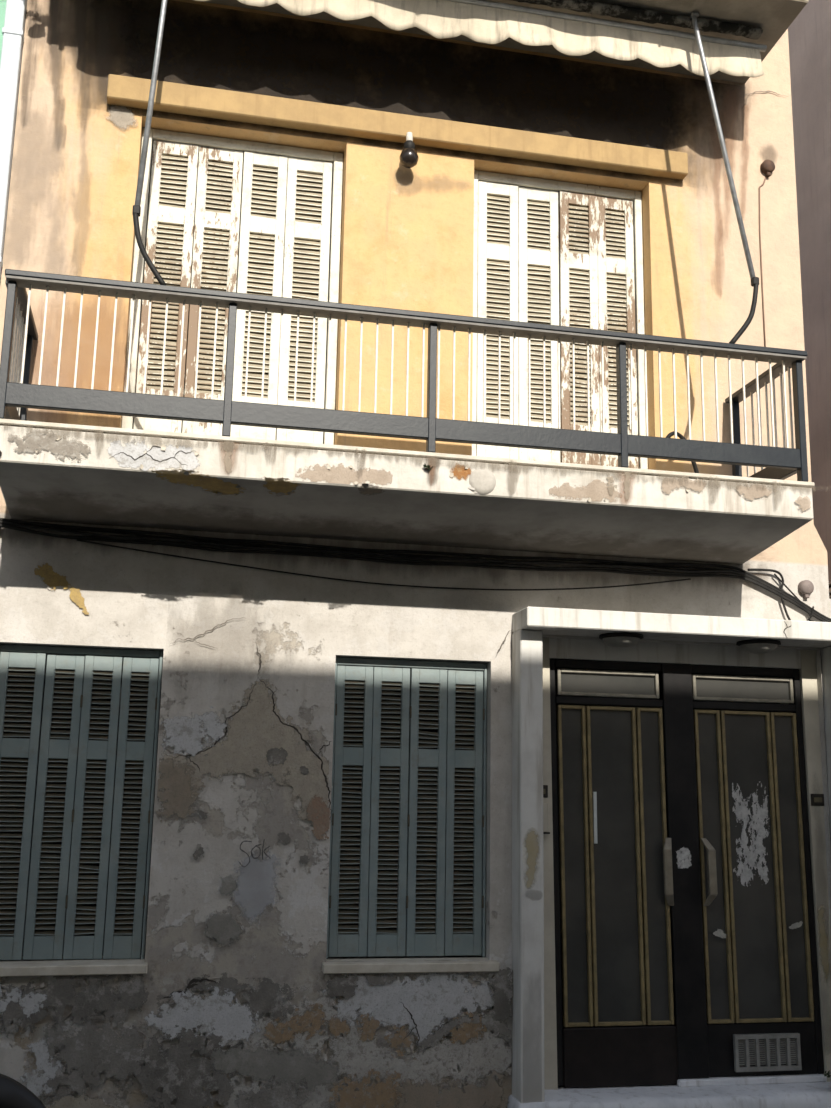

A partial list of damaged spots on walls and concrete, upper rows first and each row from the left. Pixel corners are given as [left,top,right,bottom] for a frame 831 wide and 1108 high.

peeling [0,428,91,461]
peeling [108,439,246,496]
peeling [263,463,393,497]
peeling [549,479,622,503]
peeling [661,476,706,494]
peeling [736,483,772,500]
peeling [34,562,89,615]
crack [169,618,241,649]
crack [163,644,332,823]
spalling [161,679,332,840]
peeling [0,967,513,1108]